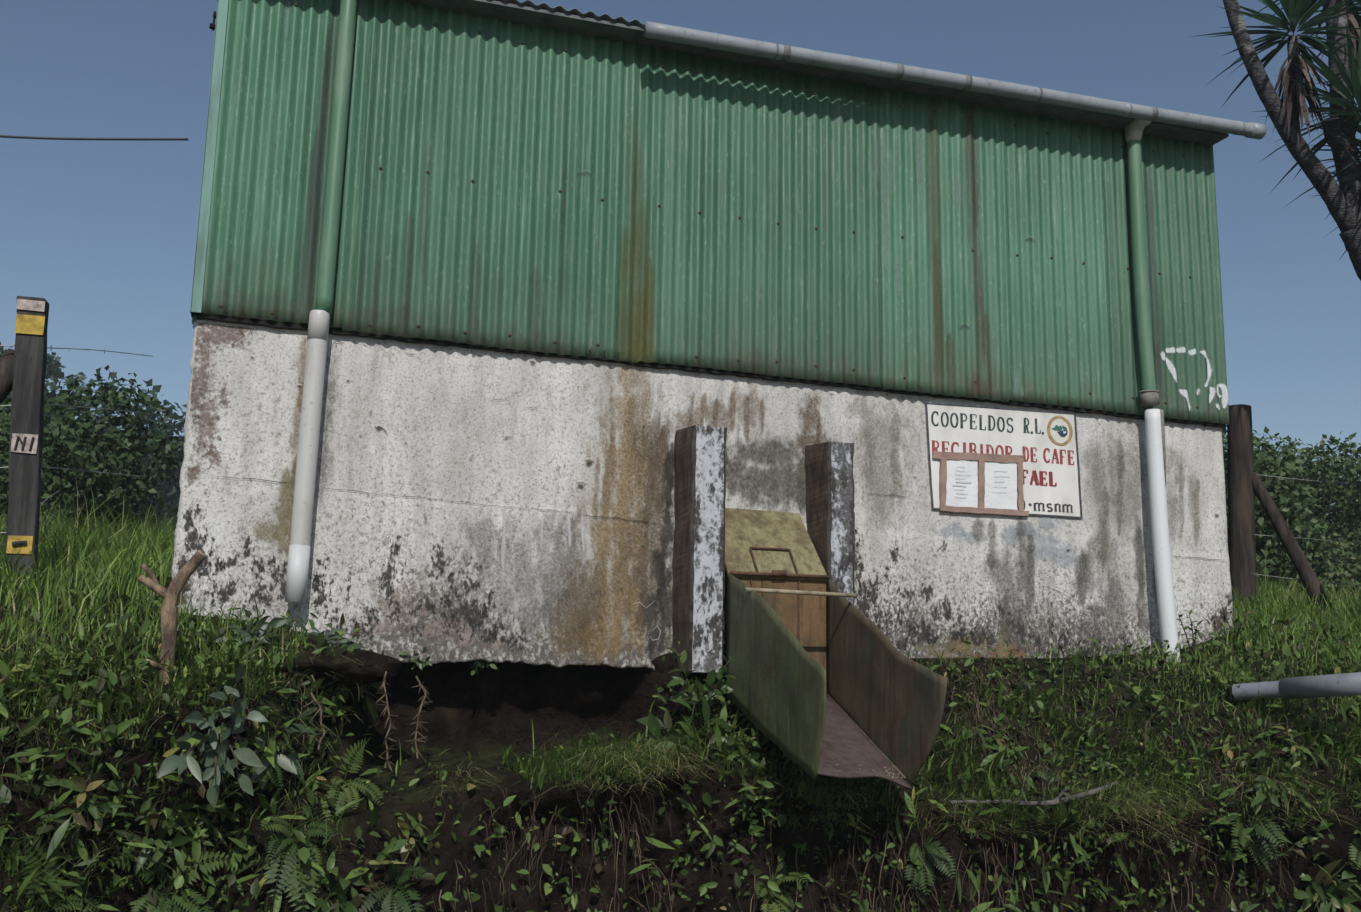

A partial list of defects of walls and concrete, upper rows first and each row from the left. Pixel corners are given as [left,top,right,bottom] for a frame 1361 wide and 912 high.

leakage [175,455,297,614]
leakage [311,535,527,652]
corrosion [563,369,650,658]
peeling [692,421,726,674]
peeling [830,441,855,593]
leakage [854,518,1157,658]
leakage [1209,592,1233,640]